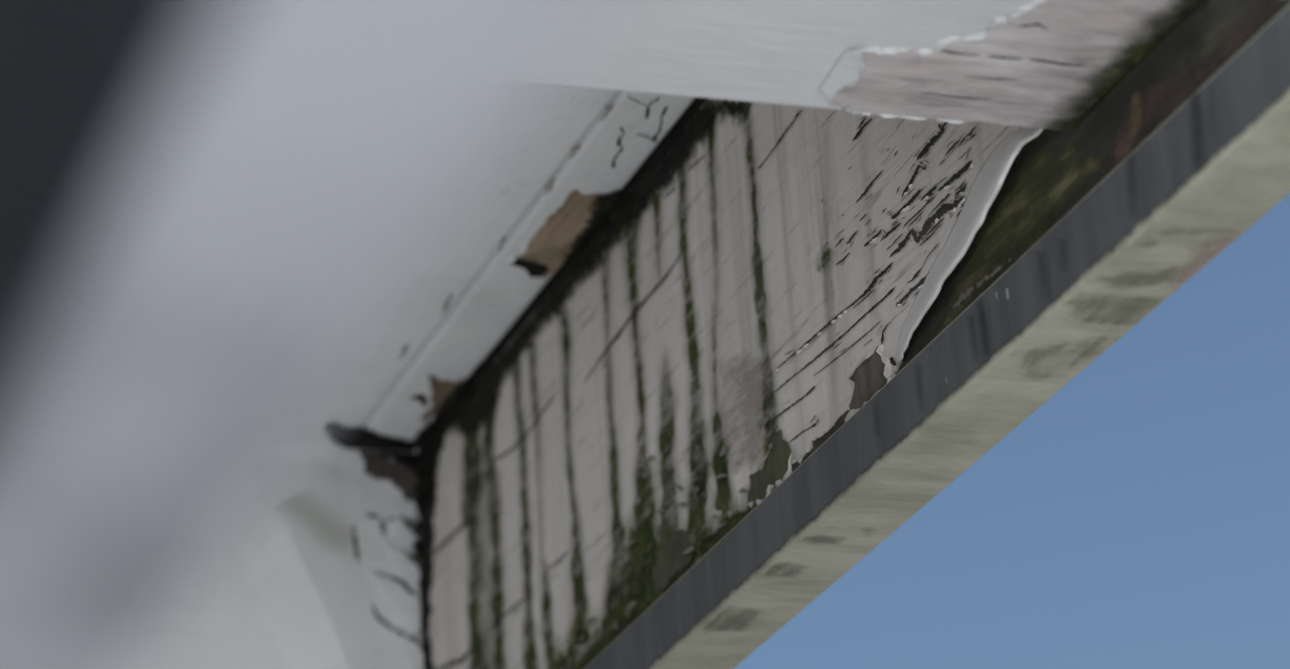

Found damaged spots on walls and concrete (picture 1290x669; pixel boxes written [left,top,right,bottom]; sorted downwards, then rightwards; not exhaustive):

crack [612,97,668,168]
peeling [820,0,1180,129]
spalling [498,189,607,278]
peeling [950,258,1012,310]
damp [422,98,778,669]
peeling [747,344,896,507]
peeling [323,374,463,669]
crack [352,485,525,669]